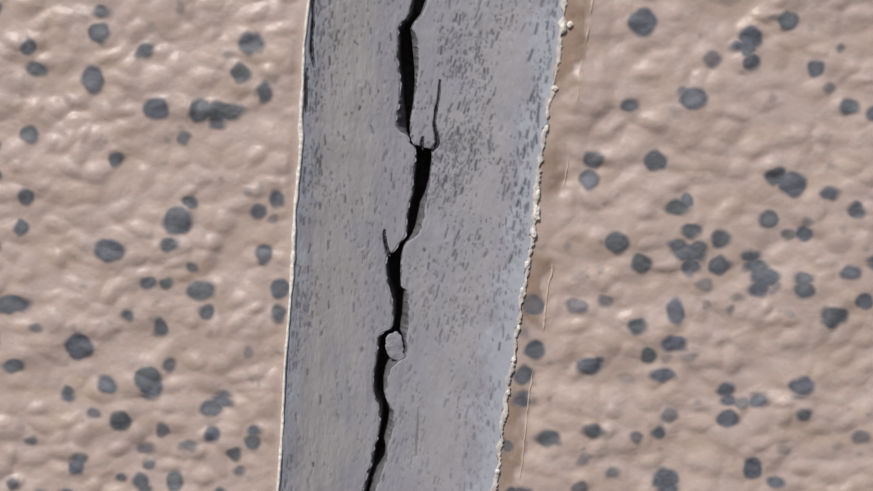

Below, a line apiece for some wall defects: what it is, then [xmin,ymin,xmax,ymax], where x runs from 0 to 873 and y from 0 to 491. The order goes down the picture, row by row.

crack [363,0,440,491]